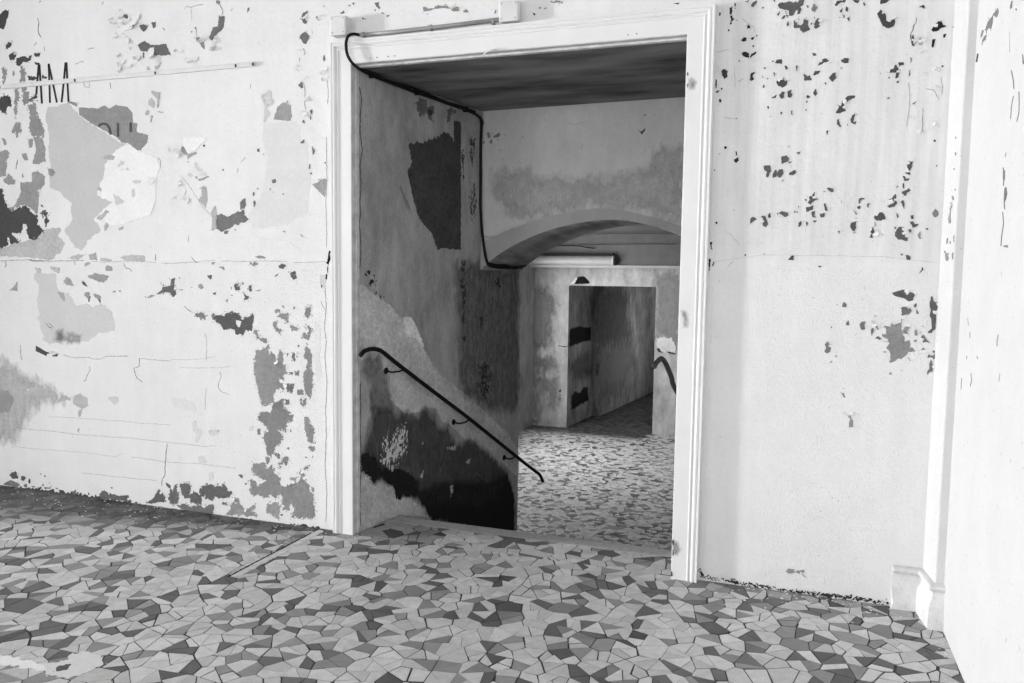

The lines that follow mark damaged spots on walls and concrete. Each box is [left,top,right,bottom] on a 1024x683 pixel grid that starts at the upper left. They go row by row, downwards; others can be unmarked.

peeling [719,0,822,62]
peeling [877,0,897,28]
peeling [750,53,849,117]
flaking render [0,10,145,345]
flaking render [172,6,328,280]
peeling [407,96,461,250]
leakage [495,150,683,218]
peeling [750,188,842,227]
peeling [838,159,928,241]
peeling [846,289,938,375]
peeling [145,262,316,520]
leakage [360,356,515,530]